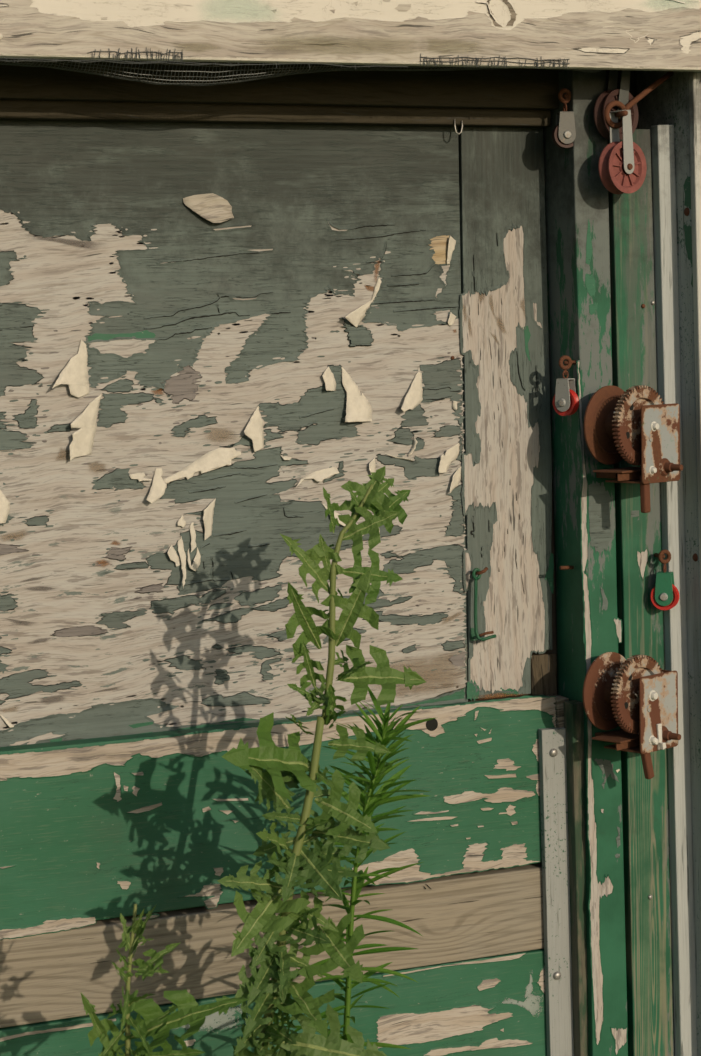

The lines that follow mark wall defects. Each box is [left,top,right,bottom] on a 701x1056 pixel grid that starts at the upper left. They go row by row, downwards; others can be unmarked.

peeling [0,0,701,68]
crack [476,1,496,21]
peeling [183,193,254,233]
peeling [0,206,556,814]
peeling [576,360,593,677]
peeling [613,618,622,643]
peeling [351,738,540,886]
peeling [586,715,628,1055]
peeling [382,952,526,978]
peeling [536,961,545,996]
peeling [375,977,533,1056]